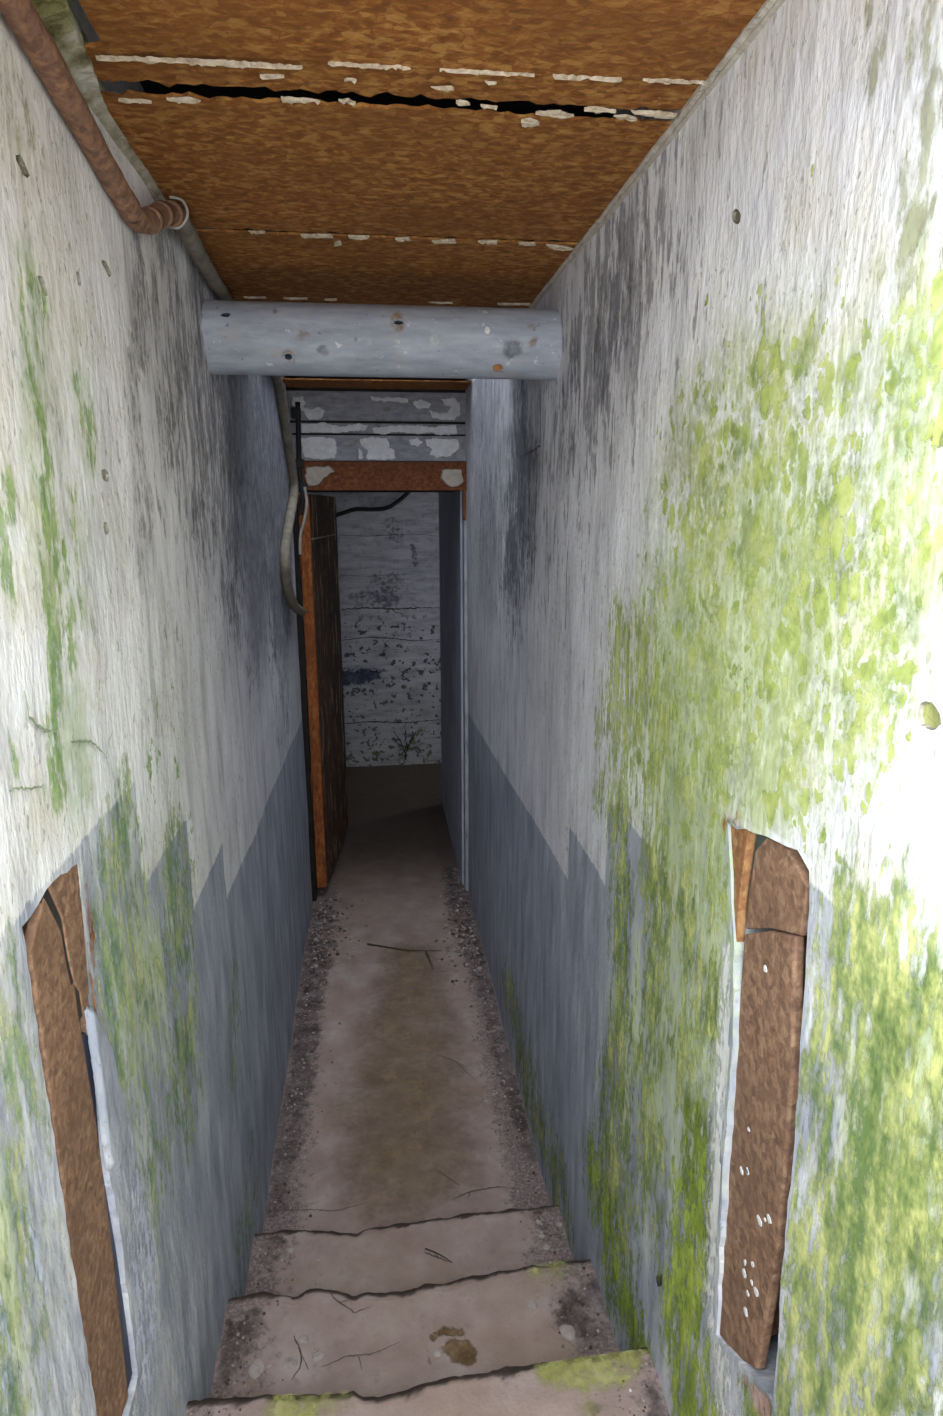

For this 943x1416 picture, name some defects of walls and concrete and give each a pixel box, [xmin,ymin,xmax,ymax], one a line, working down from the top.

peeling [96,55,303,80]
peeling [328,61,411,106]
peeling [431,68,535,110]
peeling [521,106,677,128]
peeling [292,396,461,461]
leakage [20,266,83,815]
leakage [788,467,917,762]
leakage [502,592,765,1416]
leakage [91,756,203,1416]
leakage [0,923,52,1416]
crack [330,1293,369,1313]
crack [292,1336,398,1380]